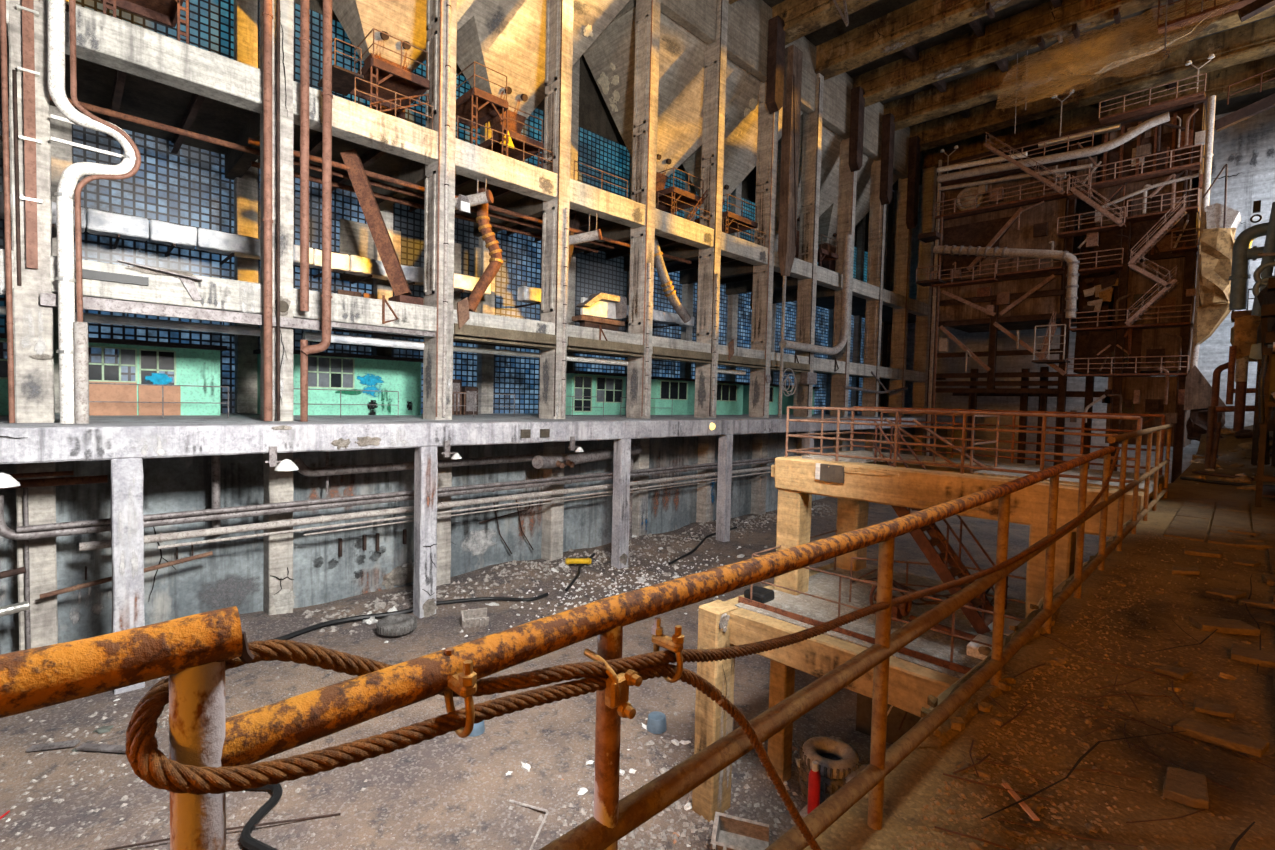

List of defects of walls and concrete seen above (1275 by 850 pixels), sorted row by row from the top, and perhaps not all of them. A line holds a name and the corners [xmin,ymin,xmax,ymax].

spalling [0,464,19,654]
spalling [55,460,112,644]
leakage [199,576,259,608]
spalling [142,436,415,626]
leakage [354,503,397,595]
leakage [402,553,435,592]
spalling [450,442,543,577]
spalling [563,439,614,552]
spalling [647,436,698,534]
spalling [713,434,753,520]
spalling [766,432,797,512]
spalling [814,427,947,457]